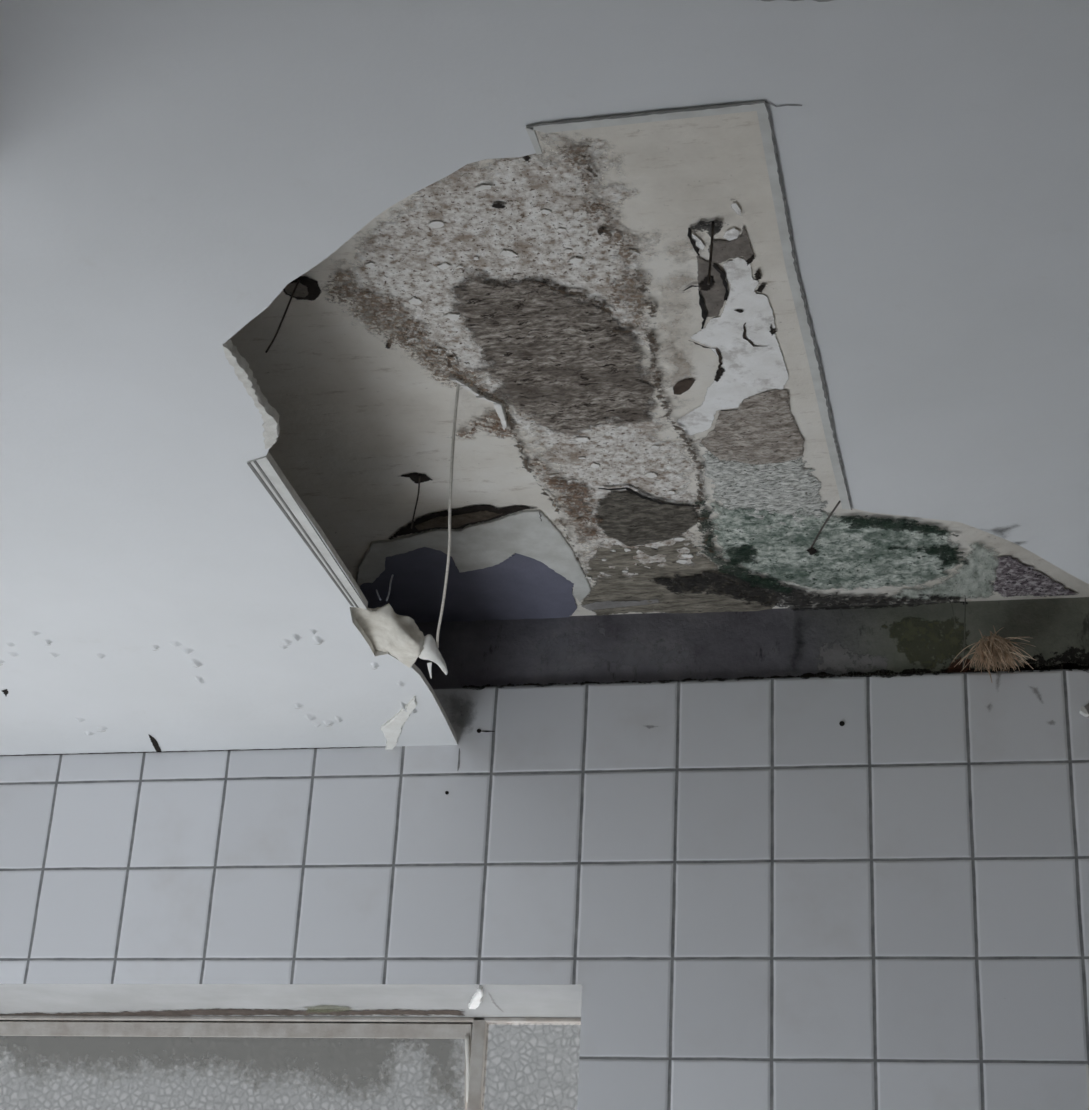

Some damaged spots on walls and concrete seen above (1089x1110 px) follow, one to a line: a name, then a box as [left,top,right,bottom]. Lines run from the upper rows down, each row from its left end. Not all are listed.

crack [758,0,833,8]
spalling [223,339,280,449]
peeling [336,134,805,678]
damp [326,271,1089,690]